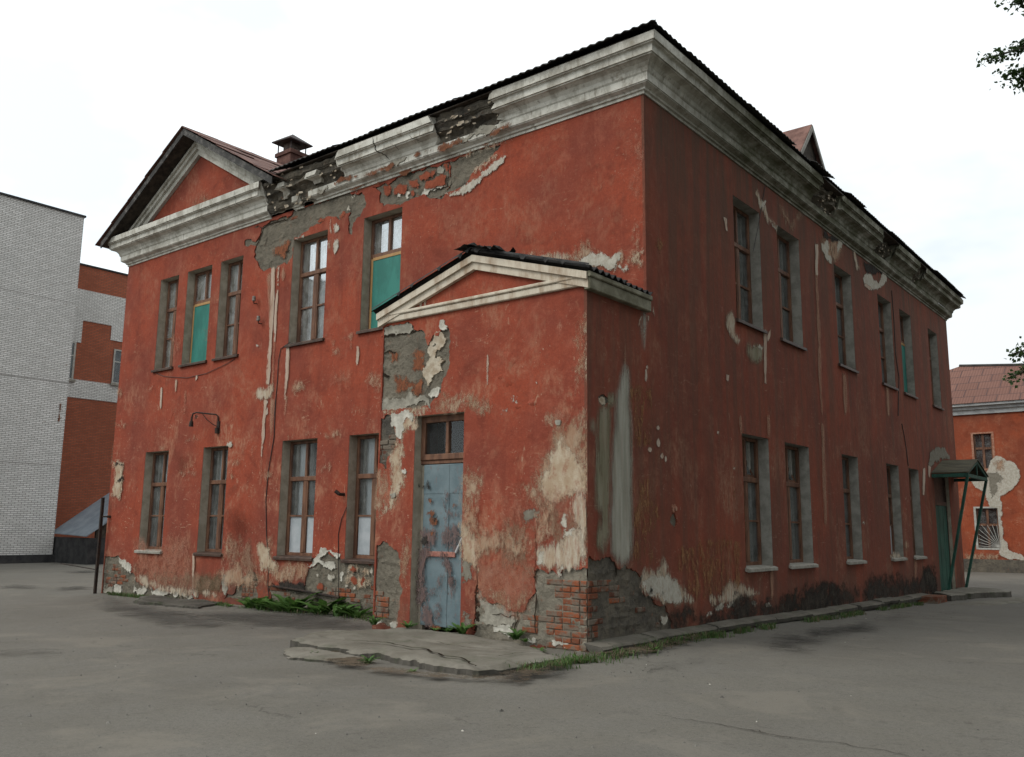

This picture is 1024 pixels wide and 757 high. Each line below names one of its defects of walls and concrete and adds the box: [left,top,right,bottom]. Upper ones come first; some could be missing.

spalling [245,99,506,271]
peeling [530,244,643,271]
spalling [854,241,892,290]
damp [261,267,289,456]
peeling [111,460,124,500]
spalling [103,535,409,628]
spalling [370,319,488,517]
spalling [458,414,694,652]
damp [592,367,633,565]
peeling [706,581,771,617]
damp [670,560,937,629]
peeling [966,456,1024,560]